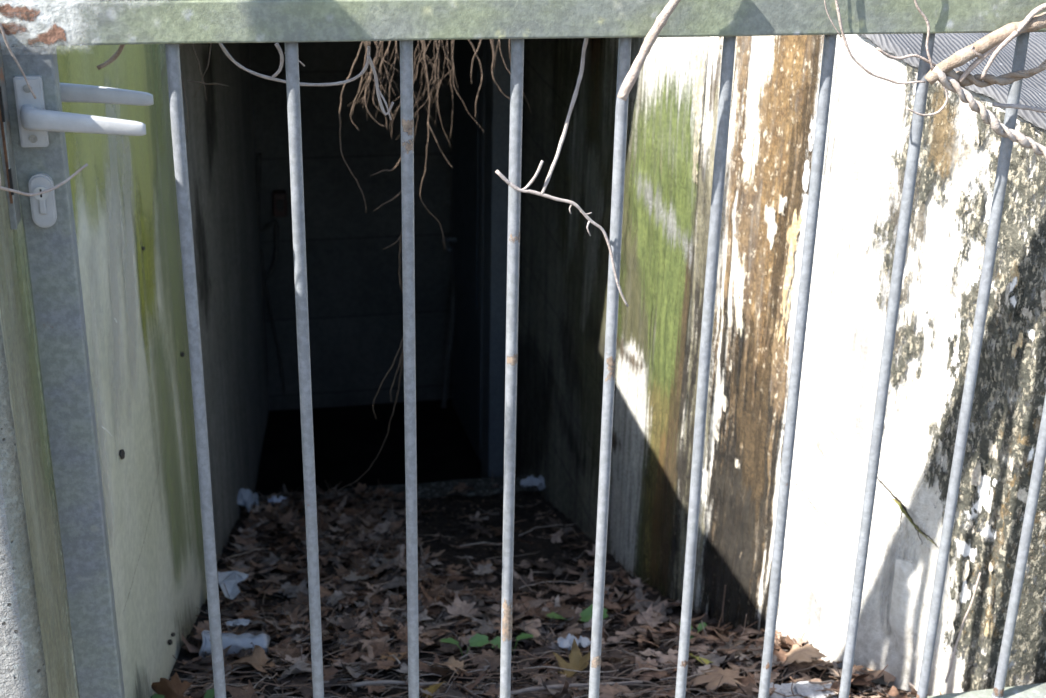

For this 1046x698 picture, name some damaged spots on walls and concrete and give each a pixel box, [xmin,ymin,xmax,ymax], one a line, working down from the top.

damp [67,44,186,571]
damp [516,35,844,638]
crack [877,476,937,546]
damp [872,64,1046,692]